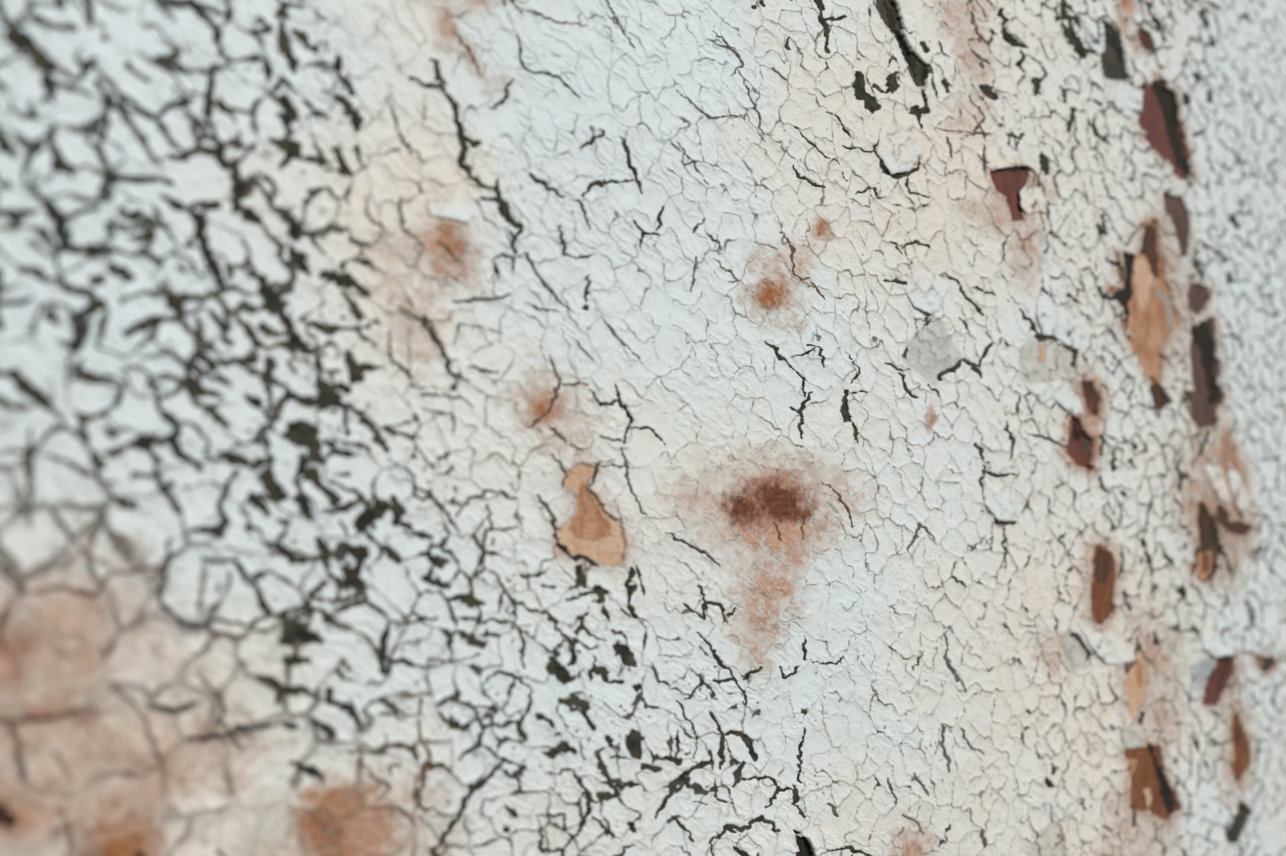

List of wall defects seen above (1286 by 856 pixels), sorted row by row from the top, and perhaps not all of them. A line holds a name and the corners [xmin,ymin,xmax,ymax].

crack [677,30,986,199]
peeling [964,144,1047,221]
peeling [1084,21,1195,180]
corrosion [524,388,567,423]
crack [336,0,872,856]
corrosion [687,460,838,665]
corrosion [751,253,802,310]
crack [765,240,1078,444]
crack [969,421,1065,569]
peeling [1106,191,1226,430]
peeling [1070,545,1180,820]
corrosion [298,786,419,856]